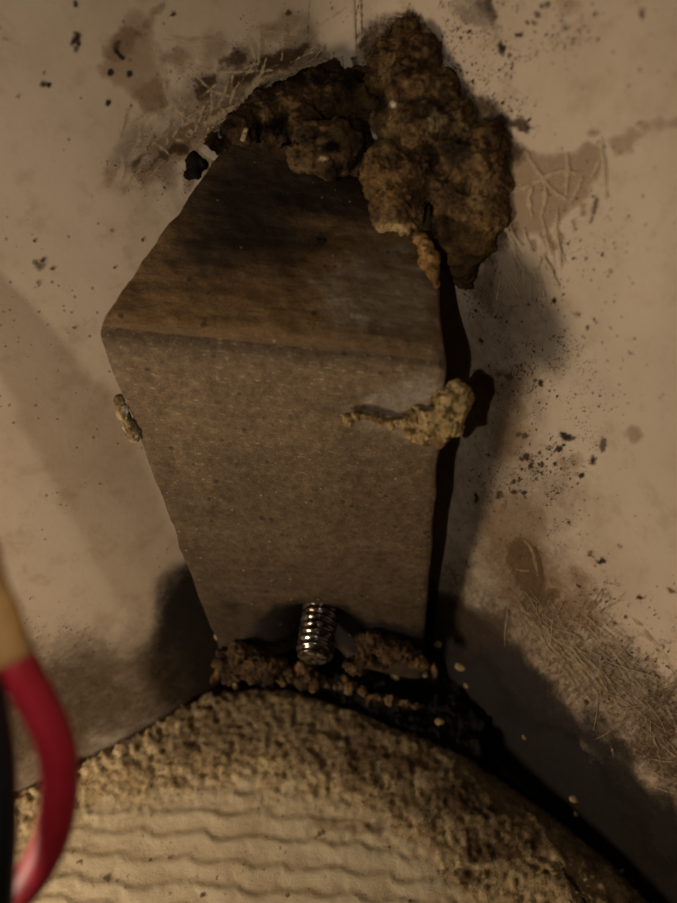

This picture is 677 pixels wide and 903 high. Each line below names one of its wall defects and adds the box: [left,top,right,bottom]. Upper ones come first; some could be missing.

peeling [101,12,343,207]